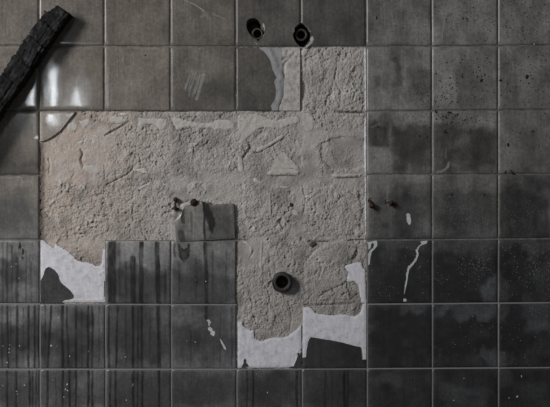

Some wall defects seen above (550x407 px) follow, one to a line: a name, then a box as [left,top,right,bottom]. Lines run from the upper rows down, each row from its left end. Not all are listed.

spalling [34,18,377,369]
leakage [131,242,143,327]
leakage [202,202,215,283]